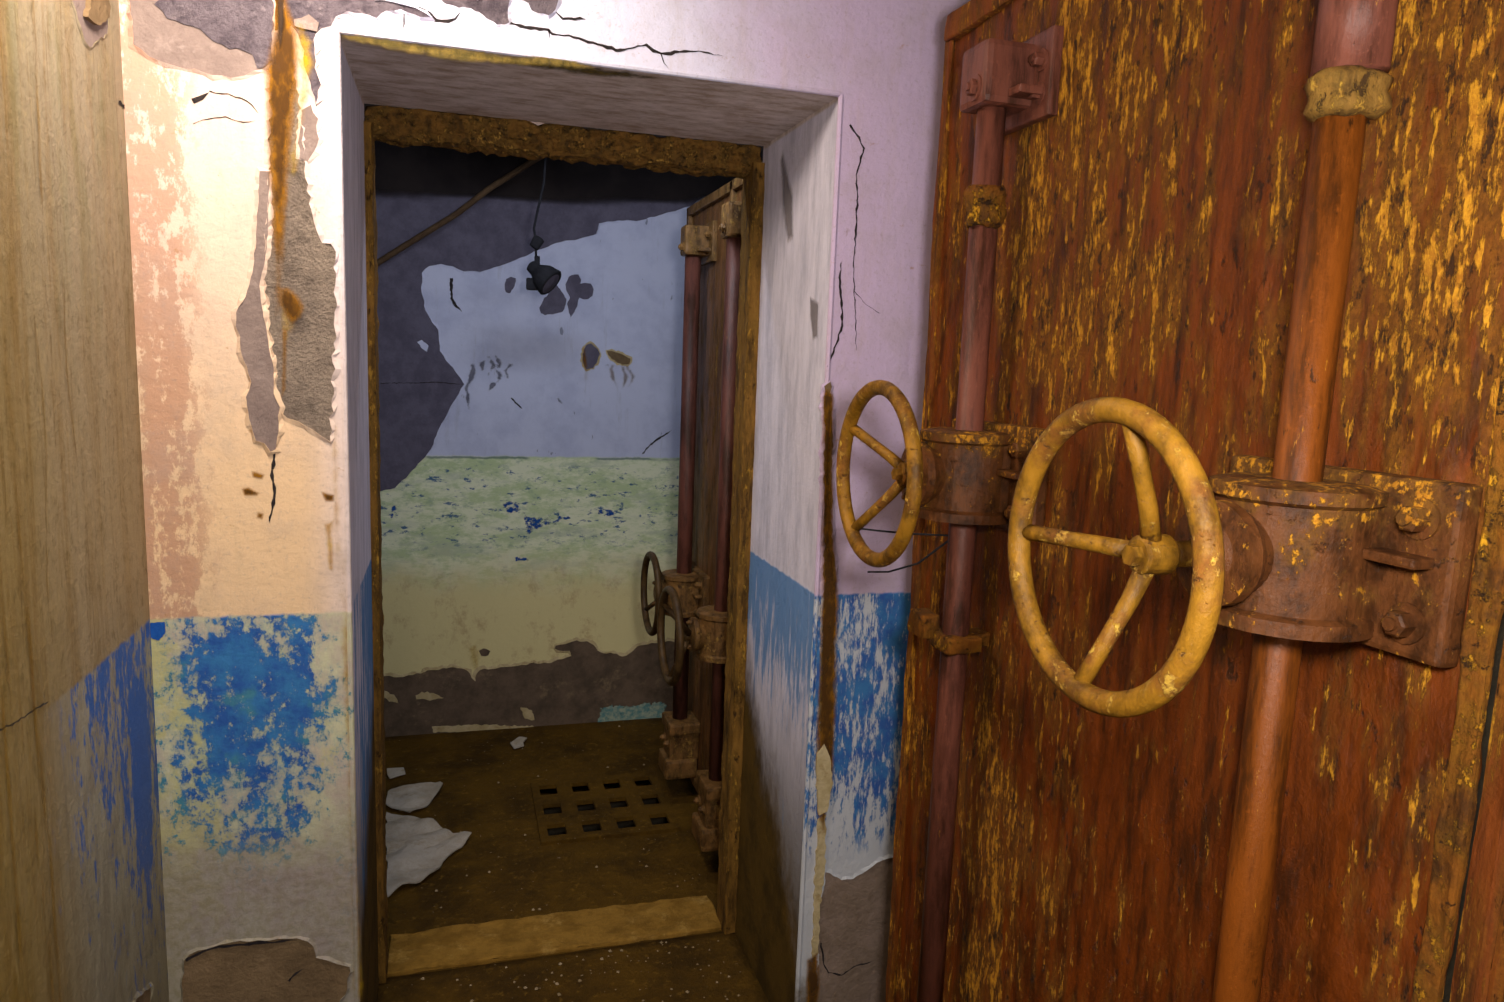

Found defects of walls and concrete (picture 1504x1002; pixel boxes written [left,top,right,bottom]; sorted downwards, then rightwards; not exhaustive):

crack [510,22,722,65]
corrosion [267,0,309,252]
spalling [71,0,584,523]
corrosion [281,289,303,390]
peeling [375,140,737,493]
peeling [150,622,165,640]
crack [0,702,48,731]
spalling [384,637,674,737]
spalling [180,935,354,1002]